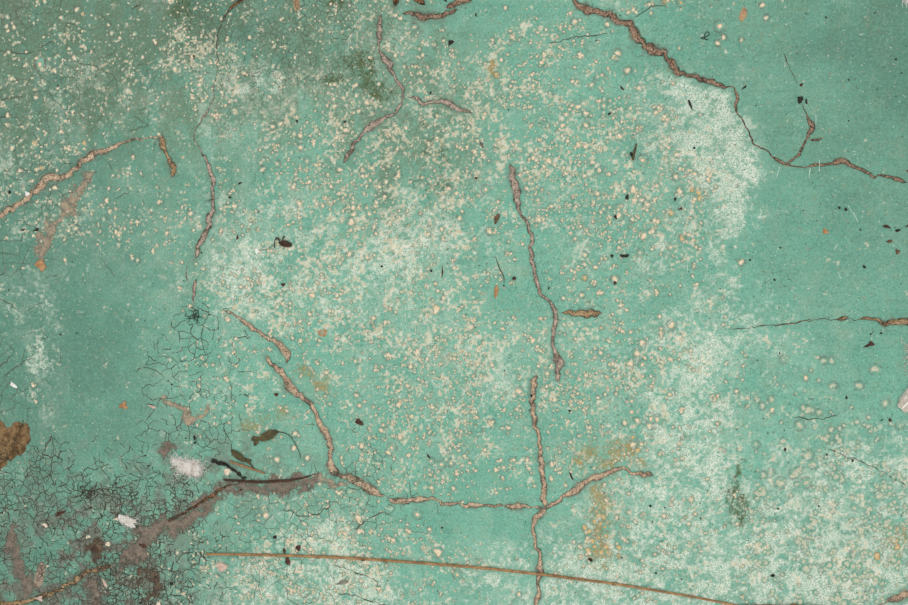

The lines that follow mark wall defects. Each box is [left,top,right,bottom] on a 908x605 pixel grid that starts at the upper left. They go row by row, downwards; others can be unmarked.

crack [551,0,908,183]
crack [0,0,653,605]
spalling [0,420,31,469]
crack [827,448,906,486]
crack [879,590,908,605]